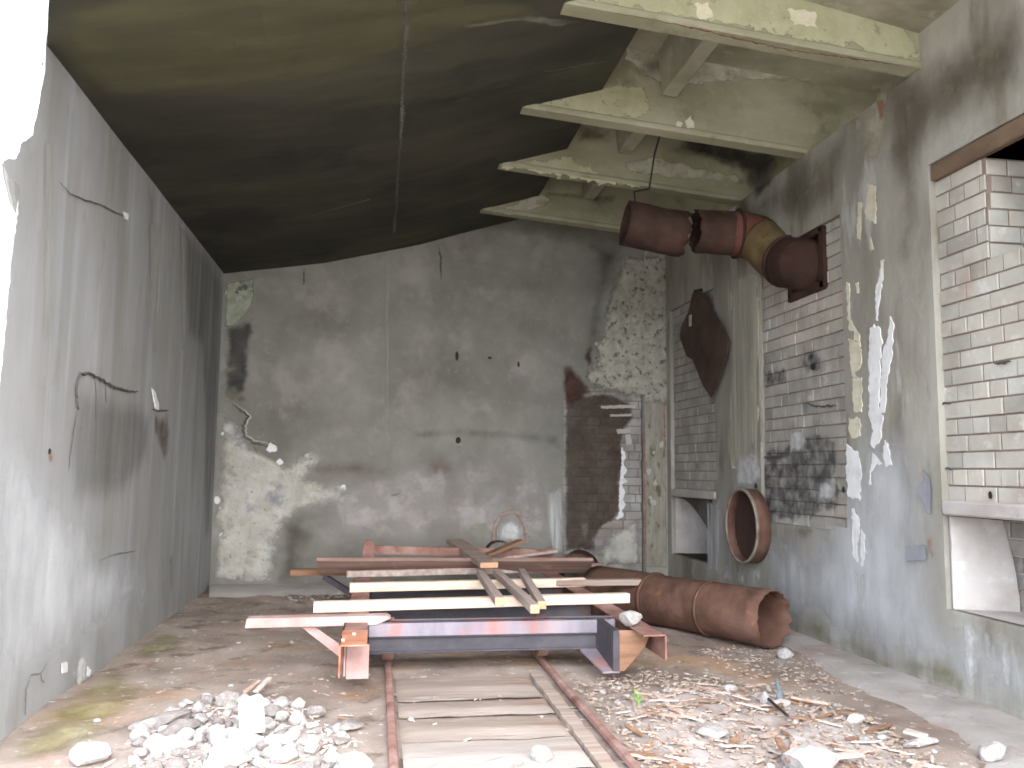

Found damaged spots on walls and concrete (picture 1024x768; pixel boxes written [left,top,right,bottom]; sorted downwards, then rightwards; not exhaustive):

peeling [593,0,920,59]
crack [394,0,409,232]
peeling [540,85,651,119]
water stain [894,42,1007,156]
crack [59,182,129,220]
crack [69,372,138,467]
water stain [227,324,251,399]
crack [230,401,277,454]
spalling [214,414,346,582]
spalling [587,255,667,567]
water stain [726,275,931,646]
peeling [842,184,895,567]